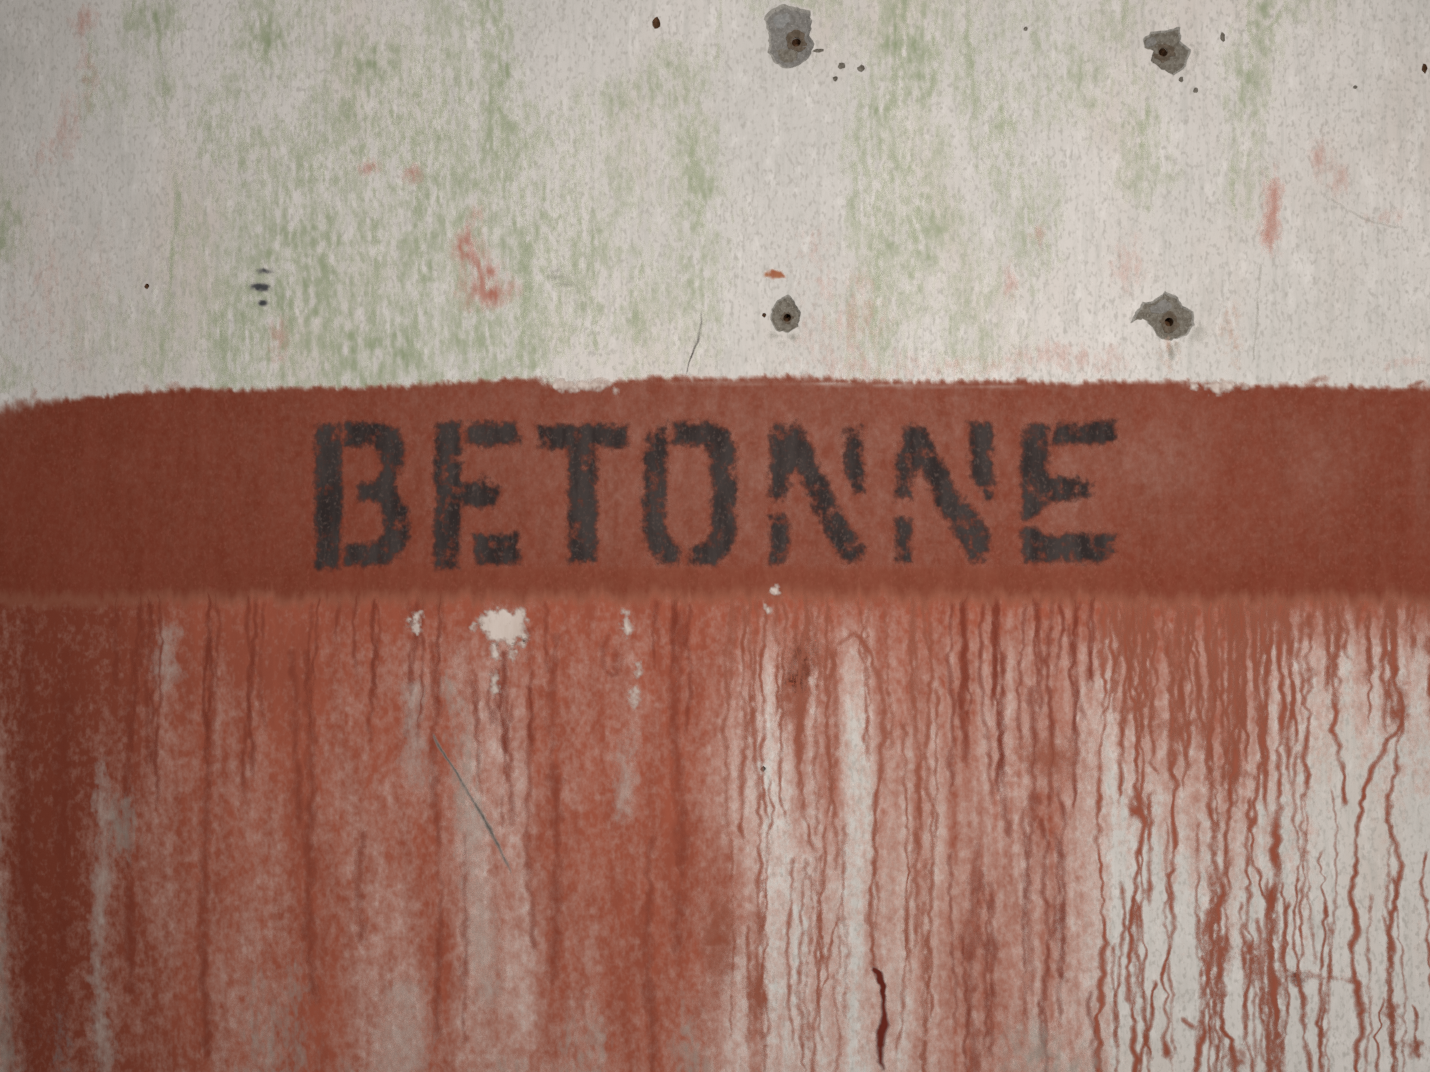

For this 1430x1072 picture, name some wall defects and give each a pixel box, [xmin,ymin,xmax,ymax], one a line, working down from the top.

peeling [470,607,528,694]